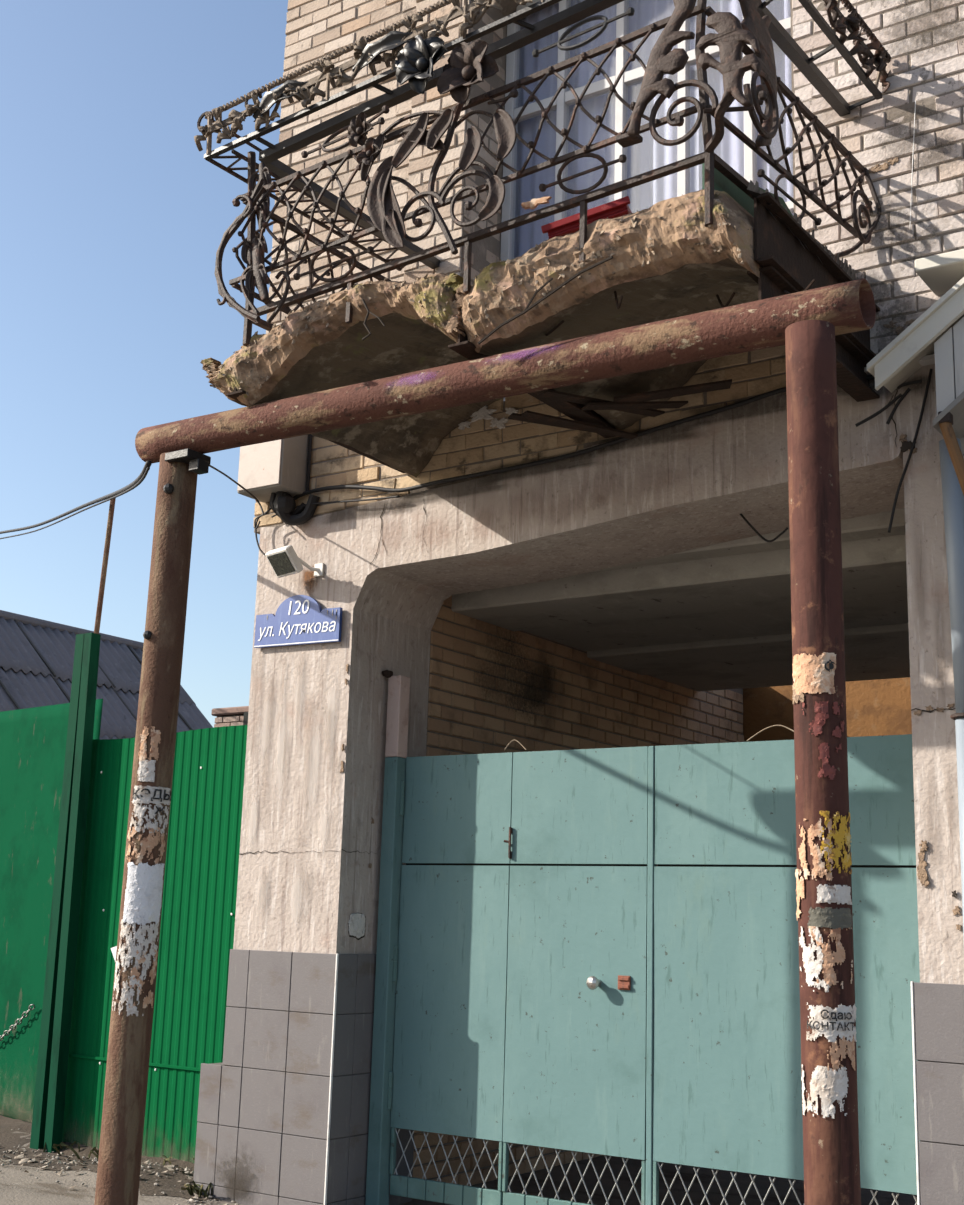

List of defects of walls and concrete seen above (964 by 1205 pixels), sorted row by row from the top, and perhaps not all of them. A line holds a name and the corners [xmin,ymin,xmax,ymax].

spalling [467,192,749,338]
spalling [210,273,448,396]
flaking render [458,406,518,430]
crack [370,504,387,564]
crack [239,848,376,856]